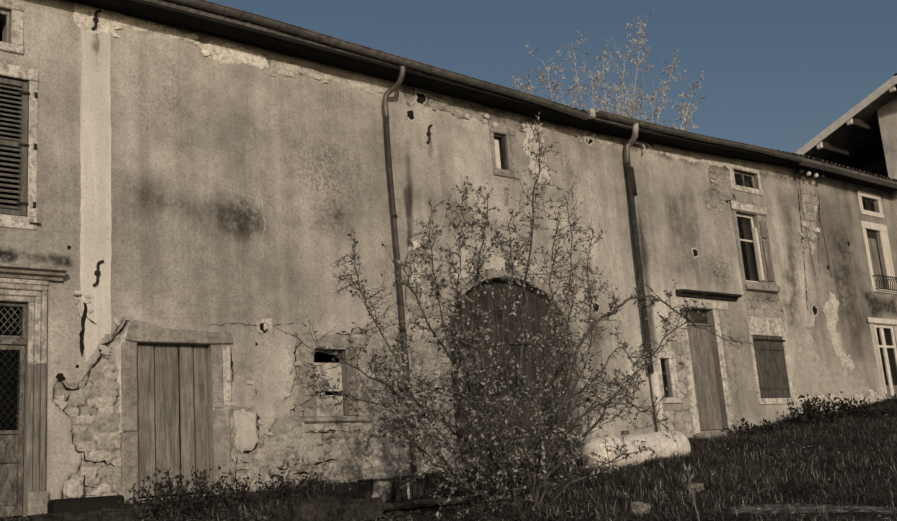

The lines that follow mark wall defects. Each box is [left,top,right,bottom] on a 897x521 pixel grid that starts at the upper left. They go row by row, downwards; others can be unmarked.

flaking render [73,3,384,96]
leakage [0,250,18,261]
flaking render [256,318,273,336]
flaking render [791,292,886,417]
flaking render [231,392,305,453]
crack [210,323,338,493]